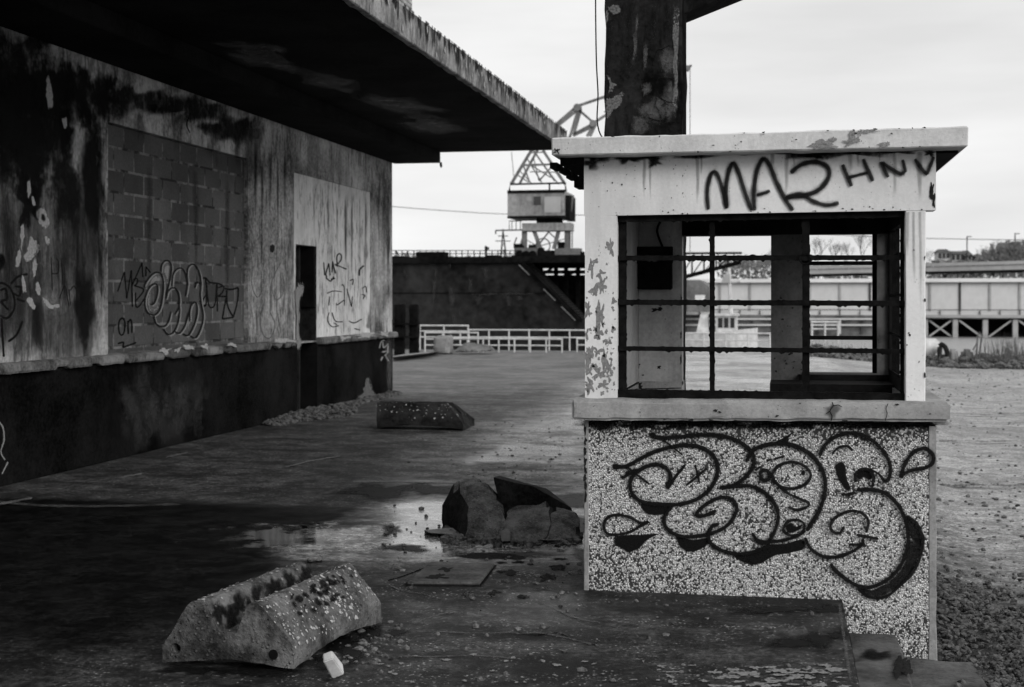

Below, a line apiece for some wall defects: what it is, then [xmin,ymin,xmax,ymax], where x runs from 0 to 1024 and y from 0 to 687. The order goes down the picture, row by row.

peeling [0,27,254,309]
peeling [605,75,624,118]
peeling [795,127,926,149]
damp [0,185,102,357]
peeling [583,238,617,396]